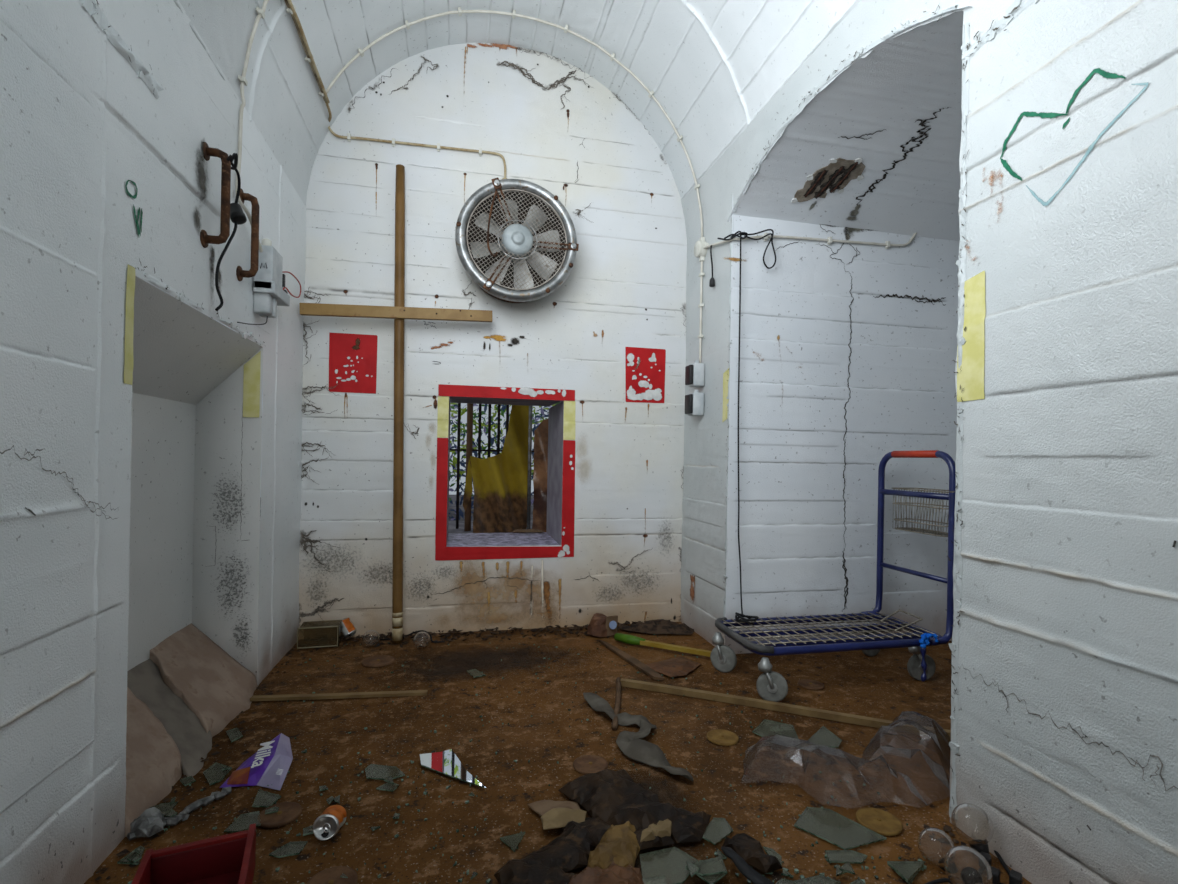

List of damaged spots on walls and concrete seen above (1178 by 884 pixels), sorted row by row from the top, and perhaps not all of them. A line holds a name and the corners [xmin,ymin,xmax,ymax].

crack [838,107,949,208]
crack [777,225,946,612]
spalling [947,0,1039,820]
crack [0,445,117,519]
mould [213,470,245,531]
mould [217,556,254,652]
damp [458,560,561,624]
crack [963,667,1178,791]